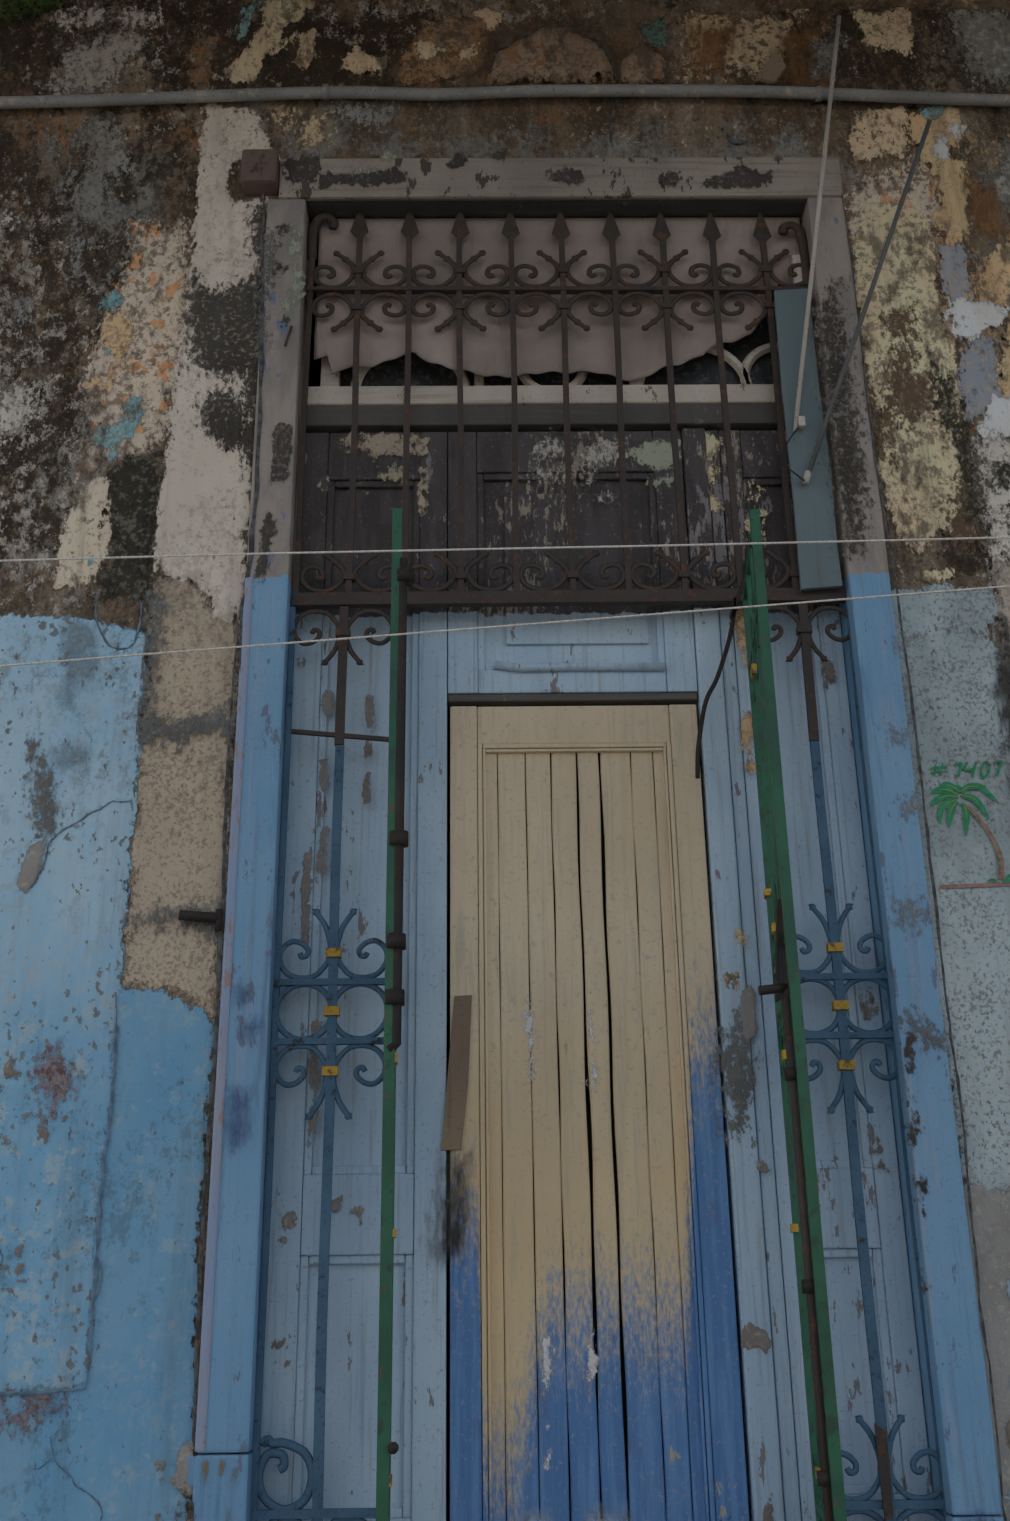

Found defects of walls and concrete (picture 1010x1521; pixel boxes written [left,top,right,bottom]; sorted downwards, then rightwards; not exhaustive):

peeling [109,5,164,37]
peeling [0,377,44,448]
peeling [53,216,196,592]
peeling [812,105,1010,655]
leakage [994,617,1010,751]
crack [17,800,133,892]
peeling [714,972,772,1173]
peeling [899,1005,955,1074]
crack [0,994,119,1397]
peeling [963,1183,1010,1521]
crack [35,1440,103,1521]
spalling [155,1440,194,1497]